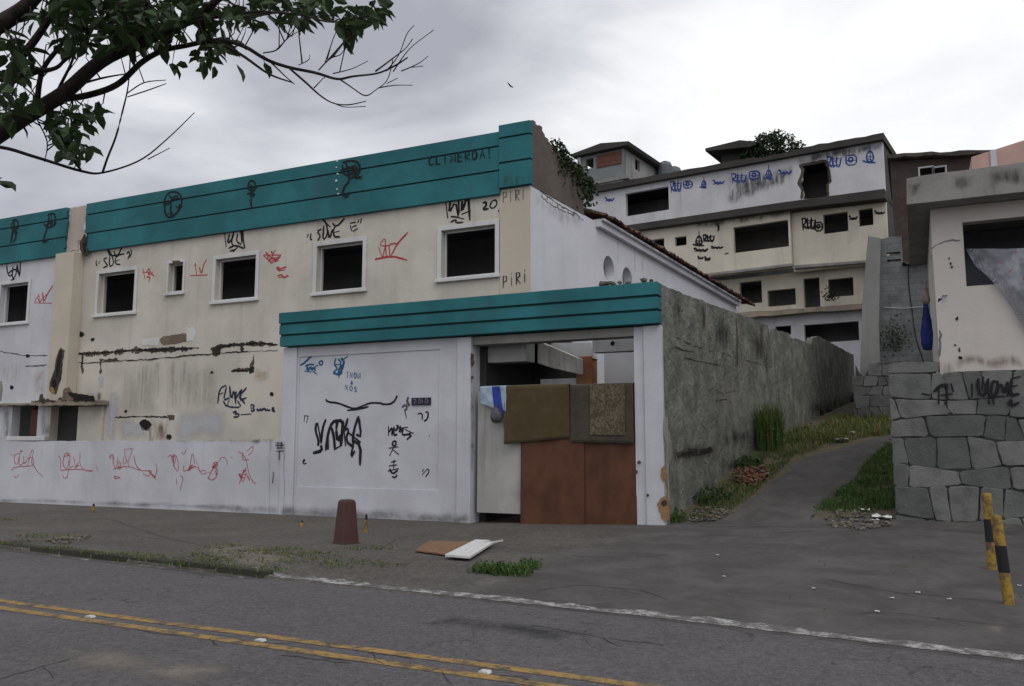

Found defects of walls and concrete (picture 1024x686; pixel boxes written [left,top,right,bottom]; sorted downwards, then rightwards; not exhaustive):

spalling [36,348,95,404]
spalling [79,326,278,374]
peeling [646,417,713,523]